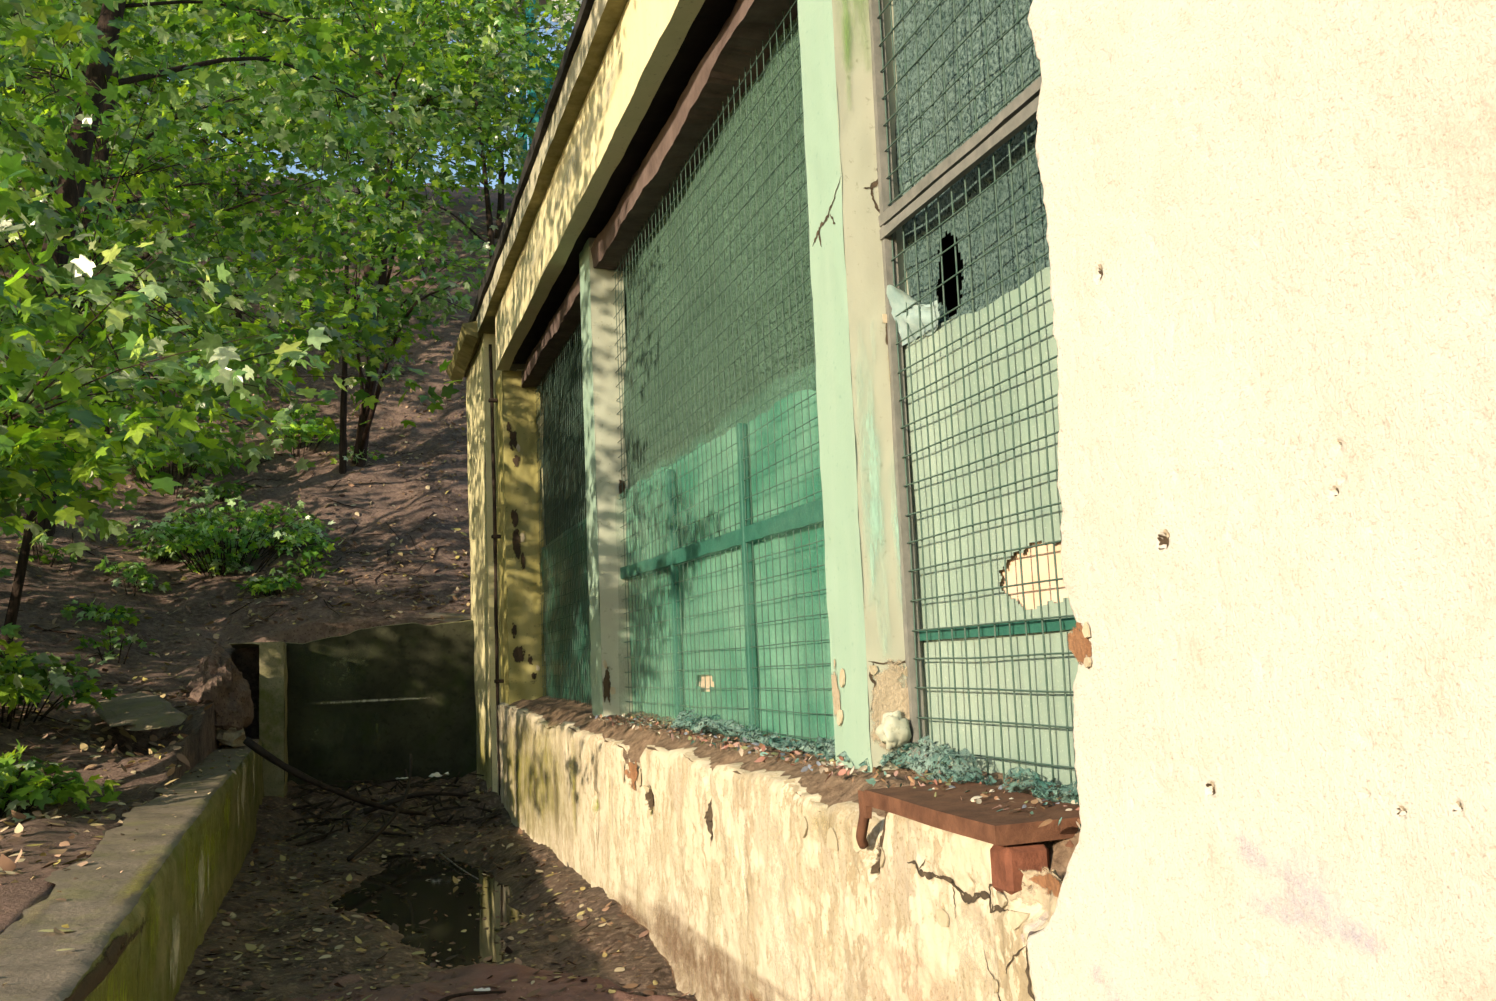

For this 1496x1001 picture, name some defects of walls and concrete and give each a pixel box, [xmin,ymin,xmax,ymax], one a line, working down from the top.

crack [812,169,880,247]
peeling [506,422,520,467]
peeling [511,509,525,570]
peeling [511,623,540,679]
spalling [1068,622,1092,668]
peeling [603,660,616,703]
spalling [831,659,845,726]
spalling [869,659,910,752]
spalling [622,760,654,815]
damp [170,924,179,979]
crack [907,860,1044,1001]